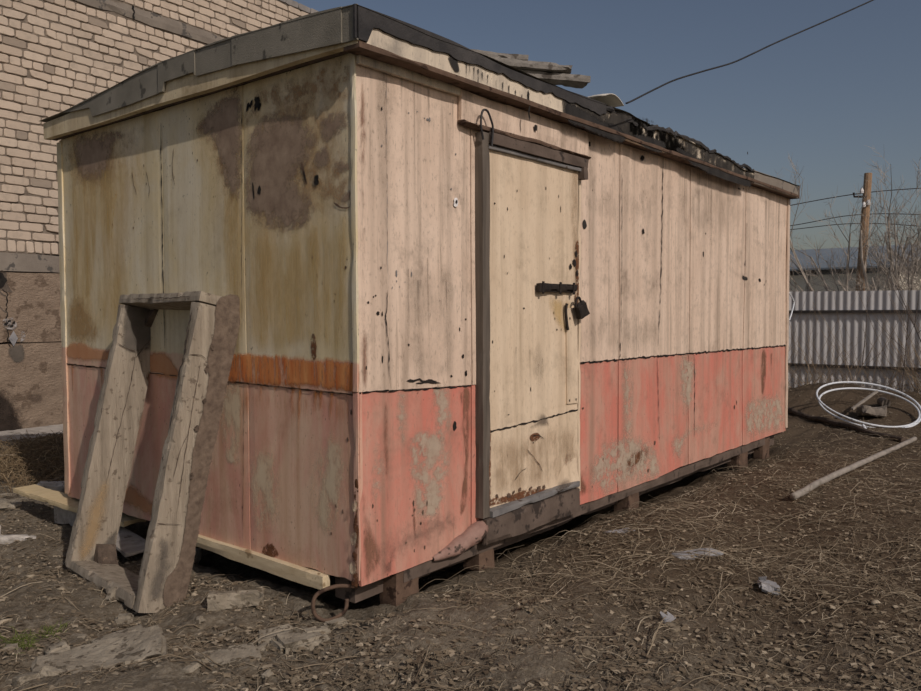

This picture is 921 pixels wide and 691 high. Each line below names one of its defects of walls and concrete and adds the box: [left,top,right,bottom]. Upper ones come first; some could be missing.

damp [200,90,241,197]
crack [0,288,13,347]
corrosion [66,303,109,384]
corrosion [228,335,353,406]
peeling [594,372,659,490]